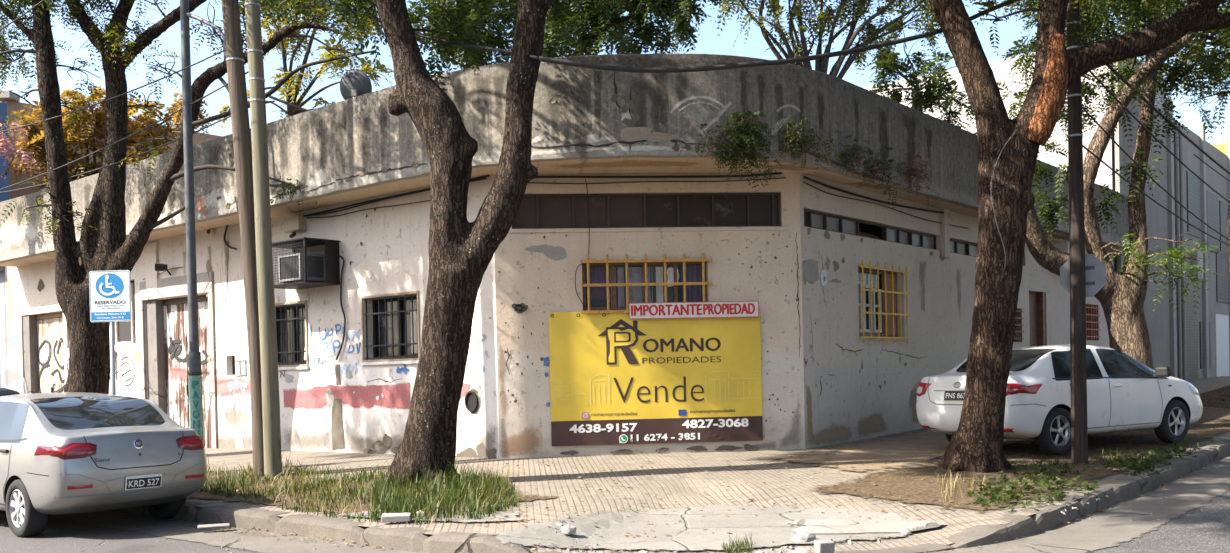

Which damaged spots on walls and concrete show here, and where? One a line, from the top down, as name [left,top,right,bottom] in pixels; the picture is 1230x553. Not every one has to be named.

water stain [444,76,503,125]
water stain [532,57,824,163]
water stain [158,184,181,221]
water stain [205,140,234,208]
water stain [277,104,386,194]